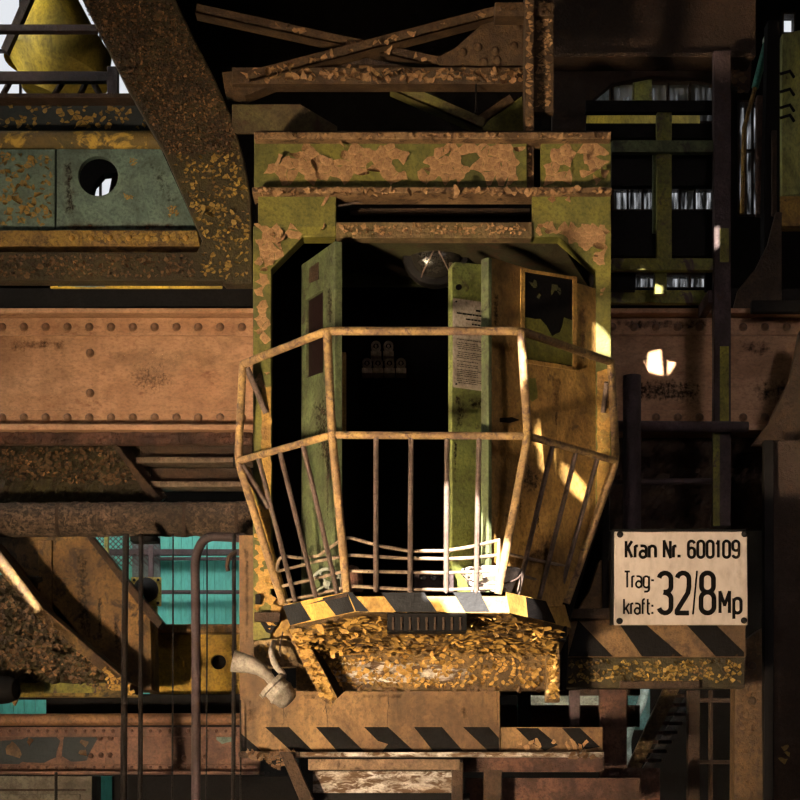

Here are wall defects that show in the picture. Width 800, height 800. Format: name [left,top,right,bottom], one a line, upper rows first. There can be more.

peeling [0,0,611,344]
peeling [0,737,97,764]